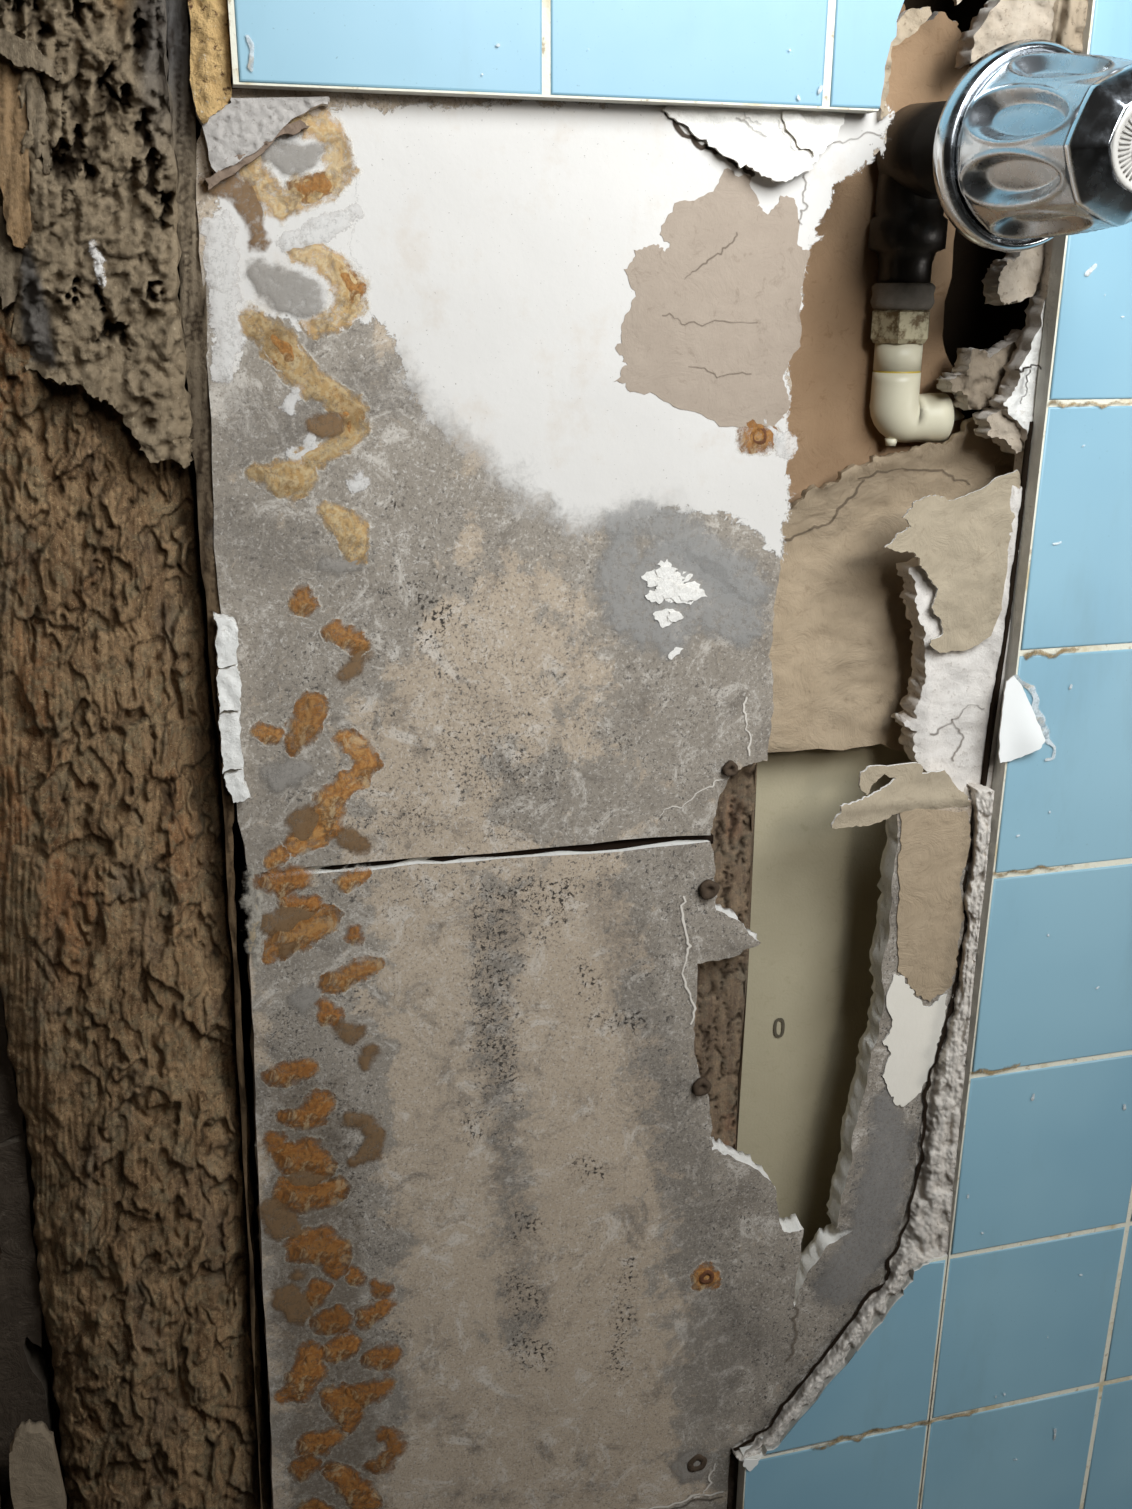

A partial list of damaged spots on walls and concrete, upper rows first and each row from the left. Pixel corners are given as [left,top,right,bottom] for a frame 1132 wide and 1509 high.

crack [664,112,755,177]
peeling [199,96,895,660]
rust [736,419,779,455]
flaking render [936,242,1047,457]
damp [410,567,452,651]
rust [248,689,385,1071]
crack [305,779,722,870]
damp [471,876,577,1089]
damp [575,957,648,1032]
crack [639,364,1042,1509]
flaking render [731,485,1045,1471]
rust [258,1058,407,1509]